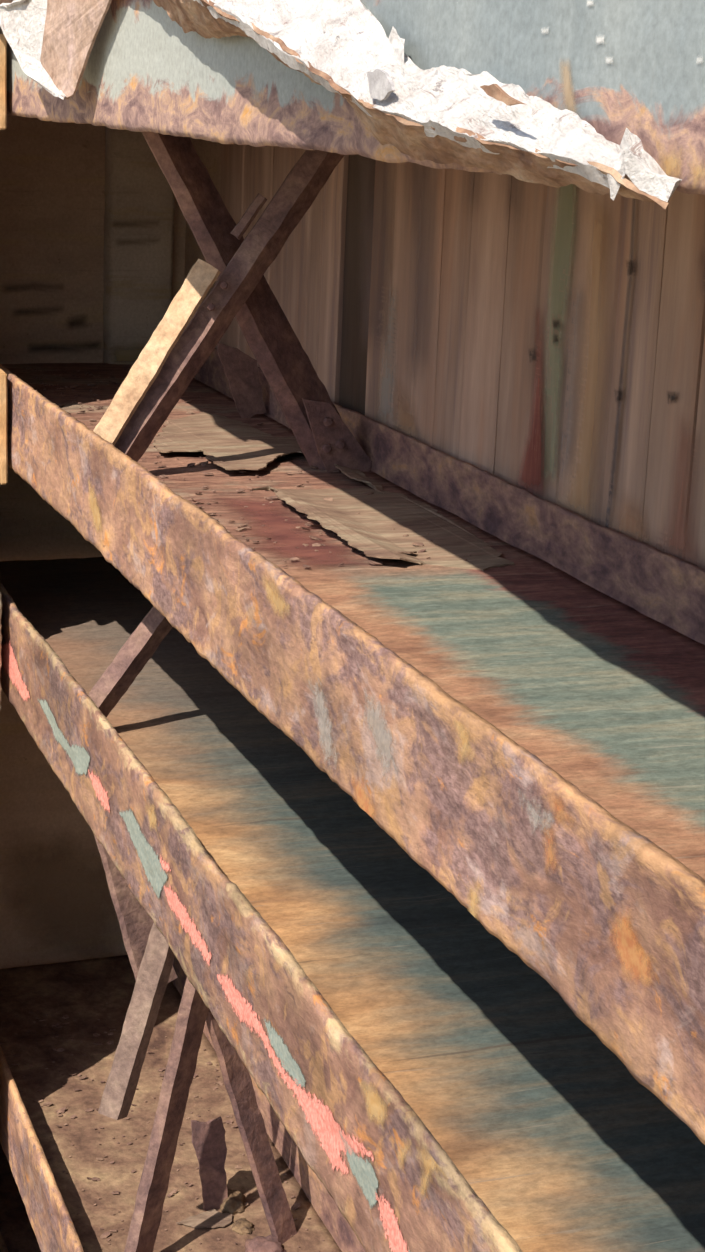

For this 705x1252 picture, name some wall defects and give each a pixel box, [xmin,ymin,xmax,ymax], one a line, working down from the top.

peeling [367,69,395,101]
peeling [480,84,527,106]
corrosion [519,322,544,491]
corrosion [228,499,356,565]
corrosion [355,784,374,817]
corrosion [470,891,478,917]
corrosion [613,916,650,981]
corrosion [364,1088,384,1120]
corrosion [422,1156,439,1190]
peeling [176,1209,232,1228]